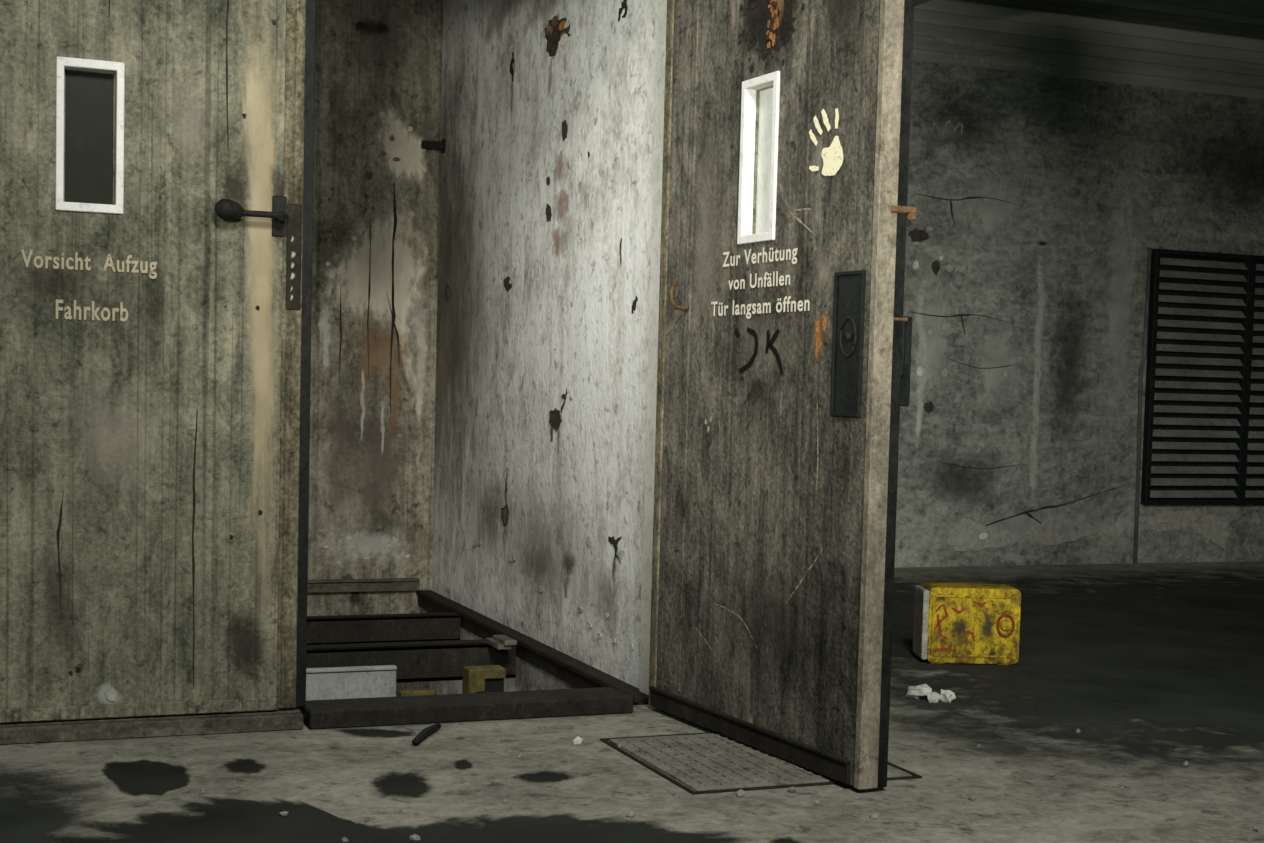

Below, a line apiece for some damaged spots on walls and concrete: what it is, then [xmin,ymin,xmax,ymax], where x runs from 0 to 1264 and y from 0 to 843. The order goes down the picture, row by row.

corrosion [766,0,782,49]
water stain [324,532,410,564]